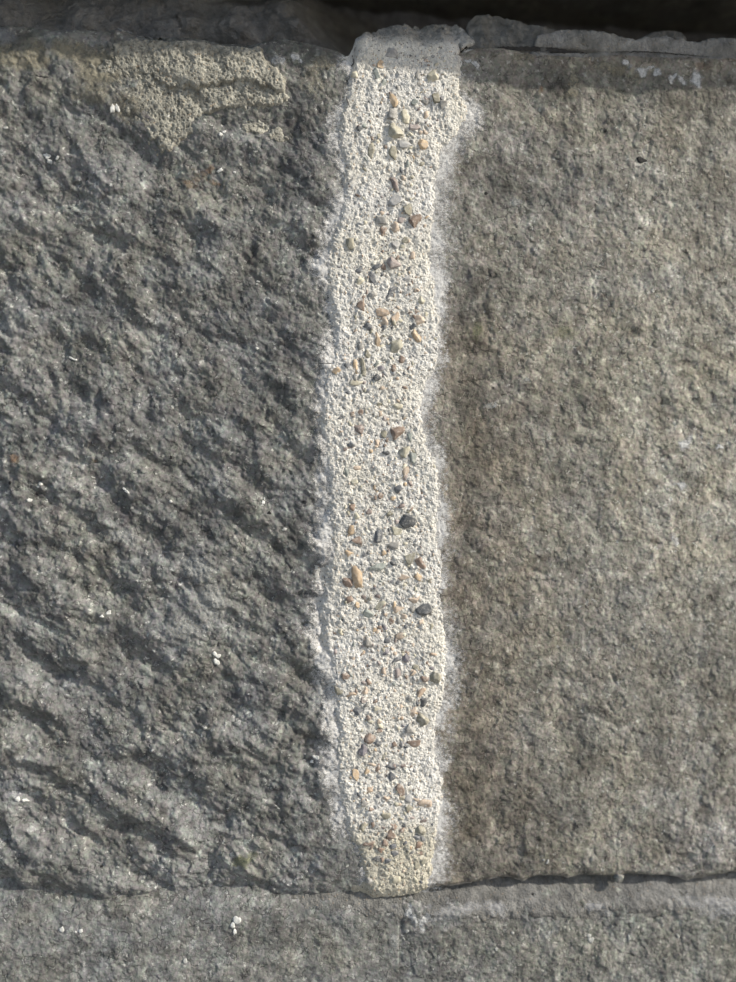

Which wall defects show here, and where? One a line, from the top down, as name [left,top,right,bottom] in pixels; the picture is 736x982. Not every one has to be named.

peeling [0,35,290,156]
damp [308,58,353,420]
damp [309,436,336,566]
damp [419,90,484,778]
damp [302,580,366,886]
damp [419,790,457,893]